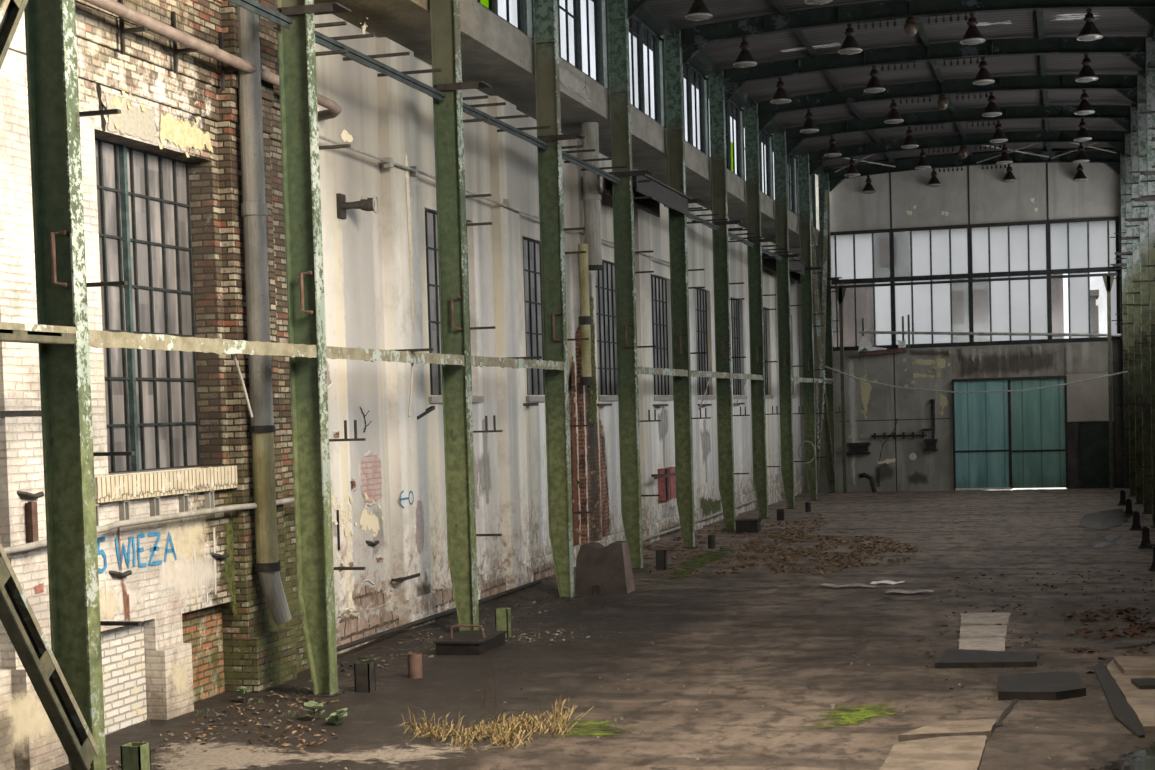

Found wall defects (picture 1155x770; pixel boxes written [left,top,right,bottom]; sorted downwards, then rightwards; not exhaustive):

peeling [105,91,213,158]
peeling [903,350,952,415]
flaking render [567,325,611,545]
flaking render [331,450,384,575]
flaking render [414,500,425,556]
flaking render [338,579,399,645]